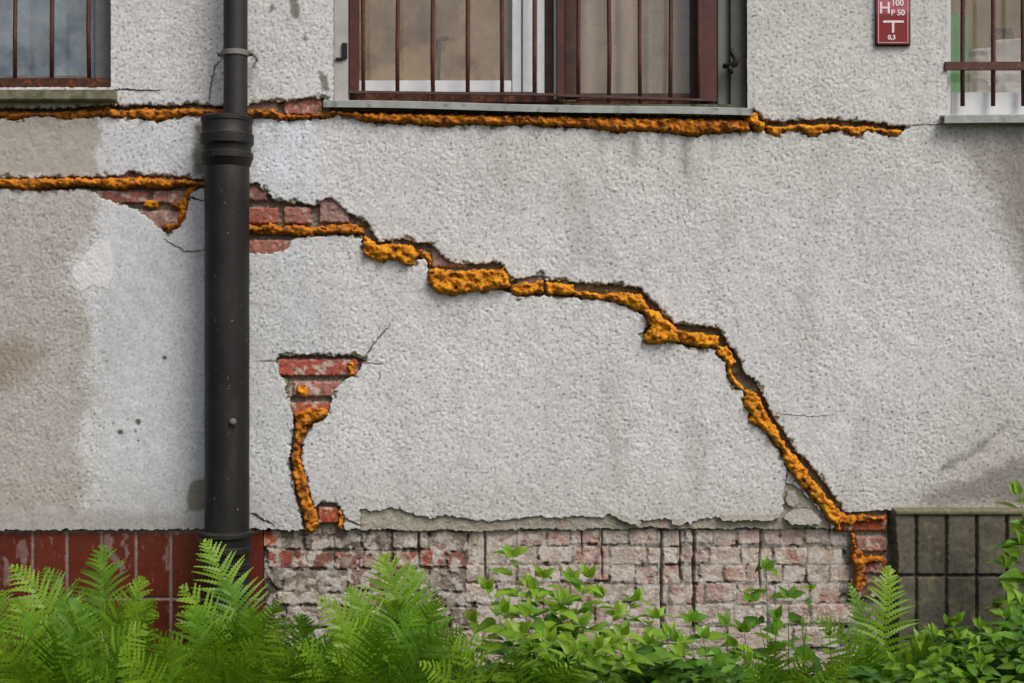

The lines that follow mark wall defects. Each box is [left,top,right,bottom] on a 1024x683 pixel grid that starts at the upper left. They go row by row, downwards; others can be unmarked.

spalling [0,172,204,252]
crack [248,98,947,138]
crack [249,183,841,530]
spalling [259,321,888,597]